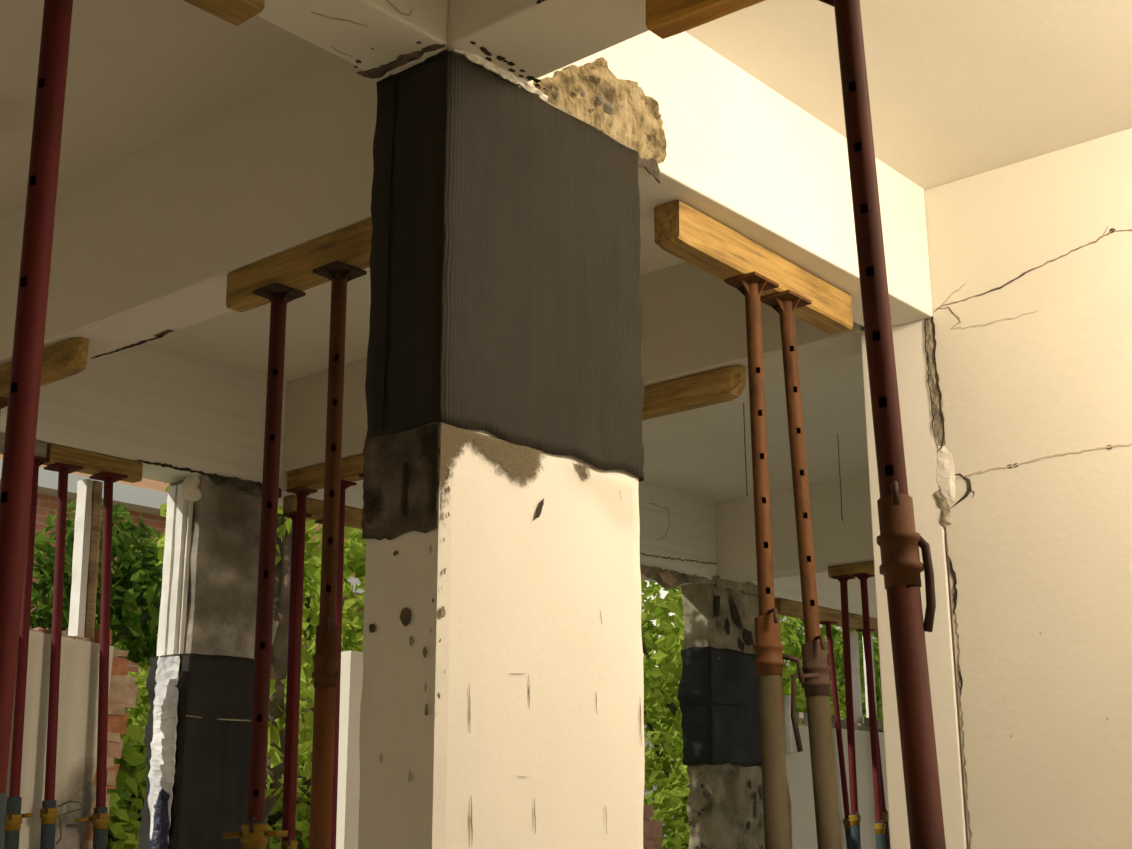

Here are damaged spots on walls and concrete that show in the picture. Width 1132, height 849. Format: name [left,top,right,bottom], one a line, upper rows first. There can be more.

spalling [354,41,667,183]
crack [90,330,173,359]
crack [924,226,1132,501]
peeling [361,422,450,556]
flaking render [400,607,427,658]
flaking render [640,564,758,652]
crack [945,530,972,849]